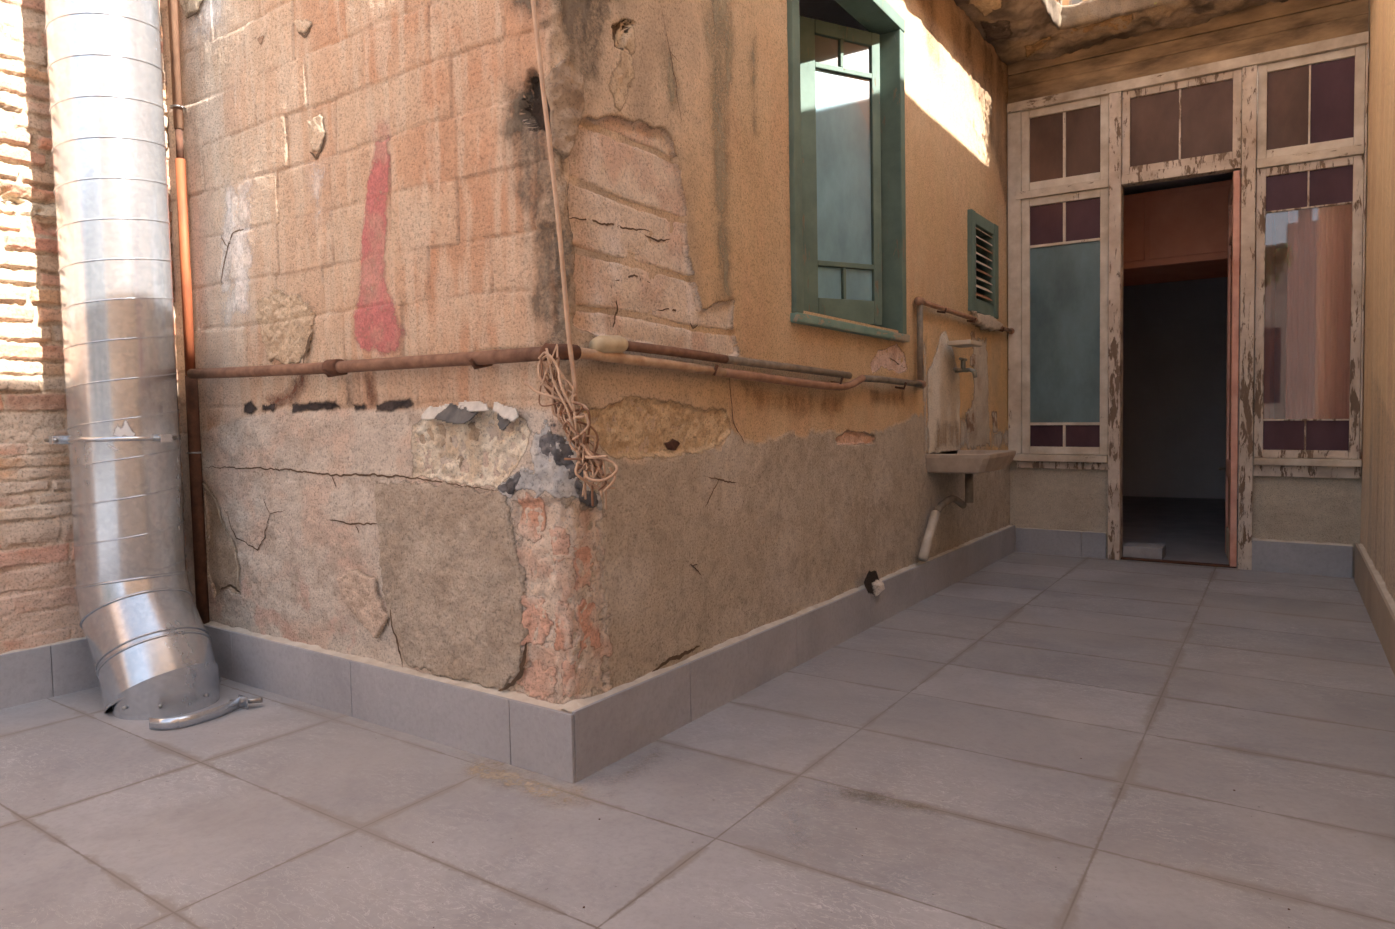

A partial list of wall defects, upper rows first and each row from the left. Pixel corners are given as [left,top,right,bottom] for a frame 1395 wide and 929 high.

water stain [513,0,544,24]
water stain [558,0,609,78]
spalling [969,0,1012,38]
water stain [505,89,574,342]
spalling [522,19,739,357]
corrosion [269,375,304,406]
corrosion [366,376,374,402]
spalling [411,400,531,488]
spalling [581,378,744,460]
peeling [337,569,389,638]
spalling [510,492,613,704]